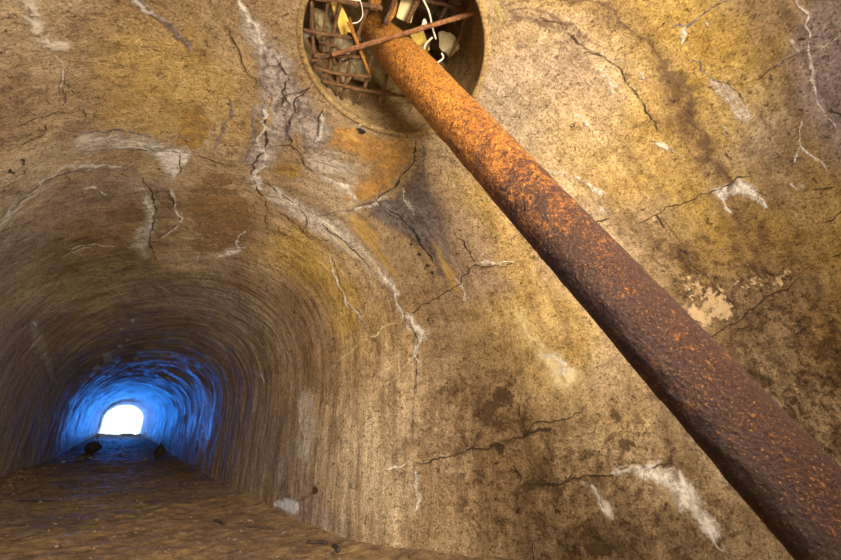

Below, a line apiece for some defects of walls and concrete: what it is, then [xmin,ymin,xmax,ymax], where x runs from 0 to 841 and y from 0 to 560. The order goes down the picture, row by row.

leakage [237,0,356,200]
crack [756,2,841,126]
leakage [72,129,191,180]
rust [332,127,410,201]
crack [0,27,515,436]
leakage [265,187,388,280]
rust [433,245,466,301]
crack [640,153,751,291]
peeling [678,273,734,330]
peeling [734,269,791,294]
crack [386,404,586,511]
leakage [628,468,720,550]